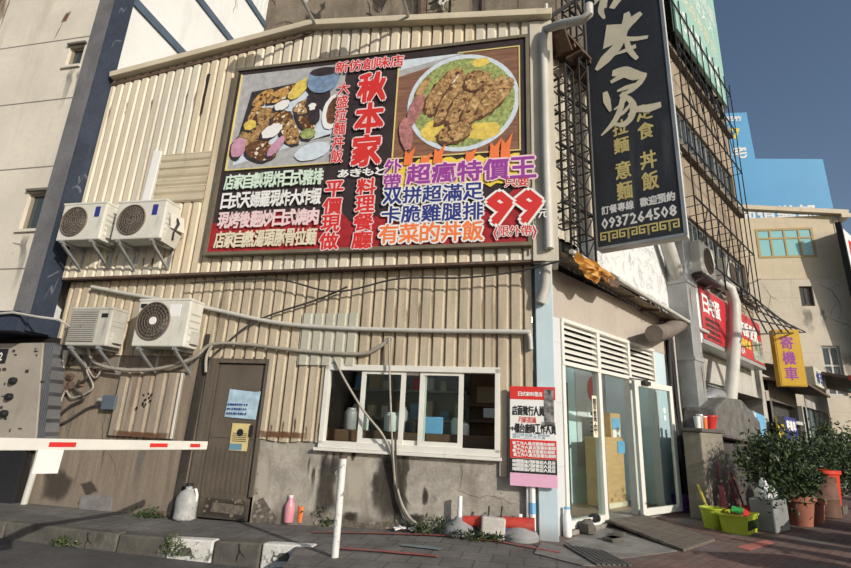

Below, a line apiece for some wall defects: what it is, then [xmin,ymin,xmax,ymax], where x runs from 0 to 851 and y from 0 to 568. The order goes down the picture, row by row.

damp [308,453,409,519]